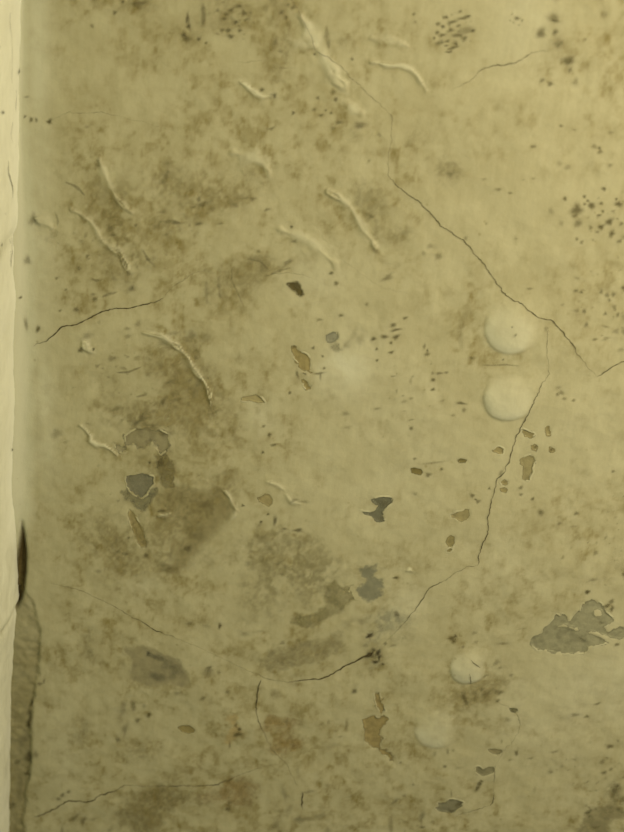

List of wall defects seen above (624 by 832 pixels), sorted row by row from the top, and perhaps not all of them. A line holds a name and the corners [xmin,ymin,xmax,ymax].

crack [394,182,579,356]
crack [47,298,163,341]
peeling [291,346,312,390]
peeling [76,421,174,548]
peeling [359,495,393,522]
crack [471,385,542,567]
peeling [297,558,390,626]
peeling [530,591,624,655]
crack [299,653,372,681]
peeling [362,693,393,760]